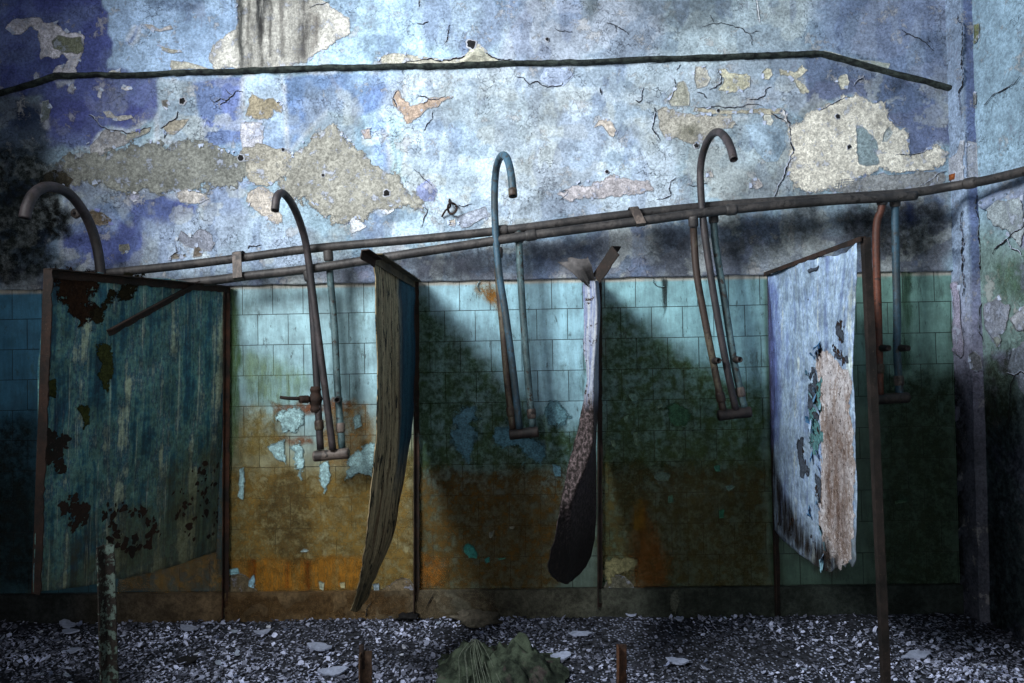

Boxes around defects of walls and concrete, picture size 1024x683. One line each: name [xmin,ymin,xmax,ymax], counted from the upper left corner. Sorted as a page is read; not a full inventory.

peeling [5,17,85,93]
peeling [143,0,350,70]
crack [405,1,575,87]
leakage [0,147,71,284]
peeling [40,94,426,234]
crack [635,64,795,197]
peeling [657,65,978,195]
crack [960,196,1024,342]
corrosion [46,428,72,474]
corrosion [57,492,161,559]
corrosion [172,398,372,591]
corrosion [372,457,440,590]